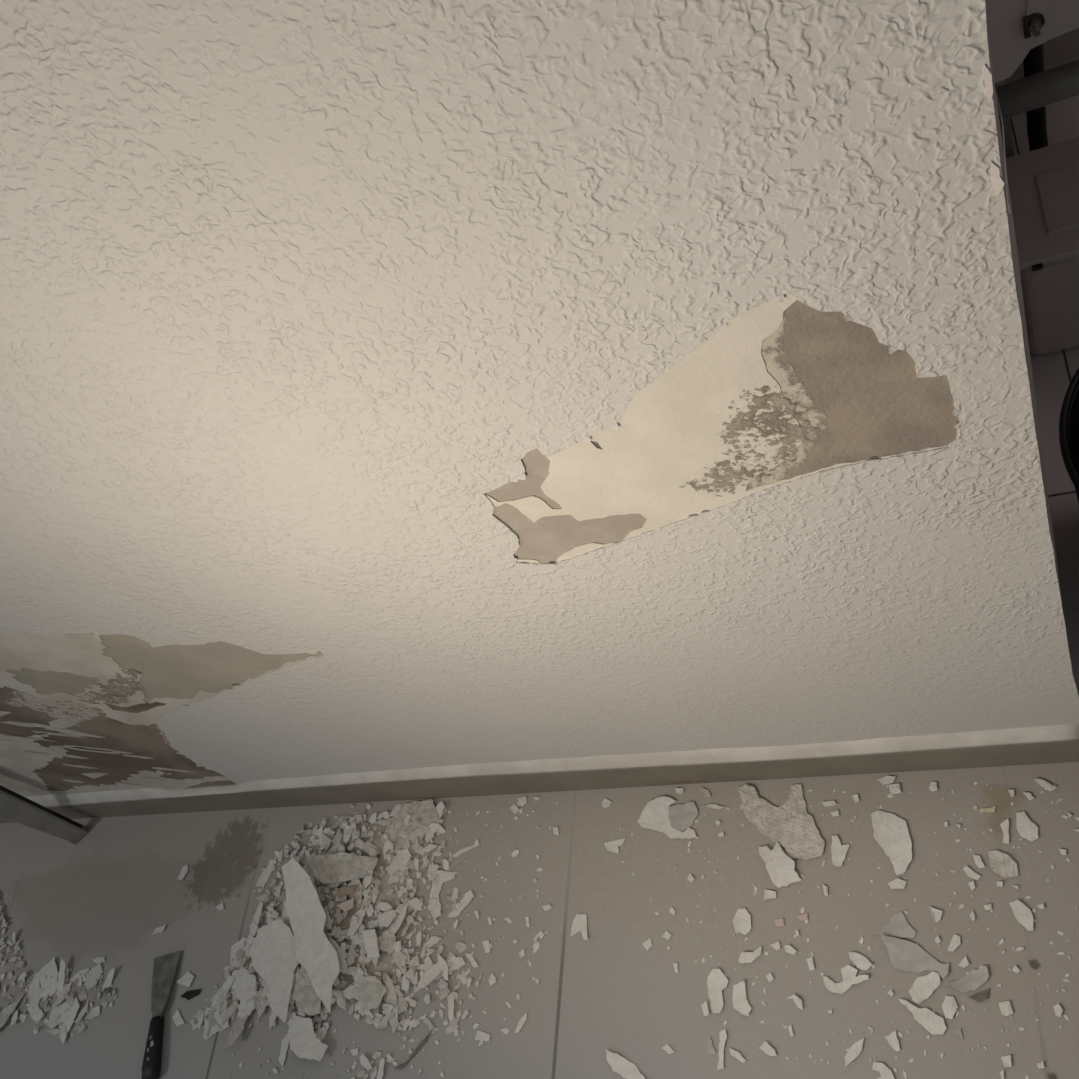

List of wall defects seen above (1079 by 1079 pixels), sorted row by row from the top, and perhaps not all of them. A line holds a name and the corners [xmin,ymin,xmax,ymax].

peeling [485,293,962,566]
peeling [0,632,322,797]